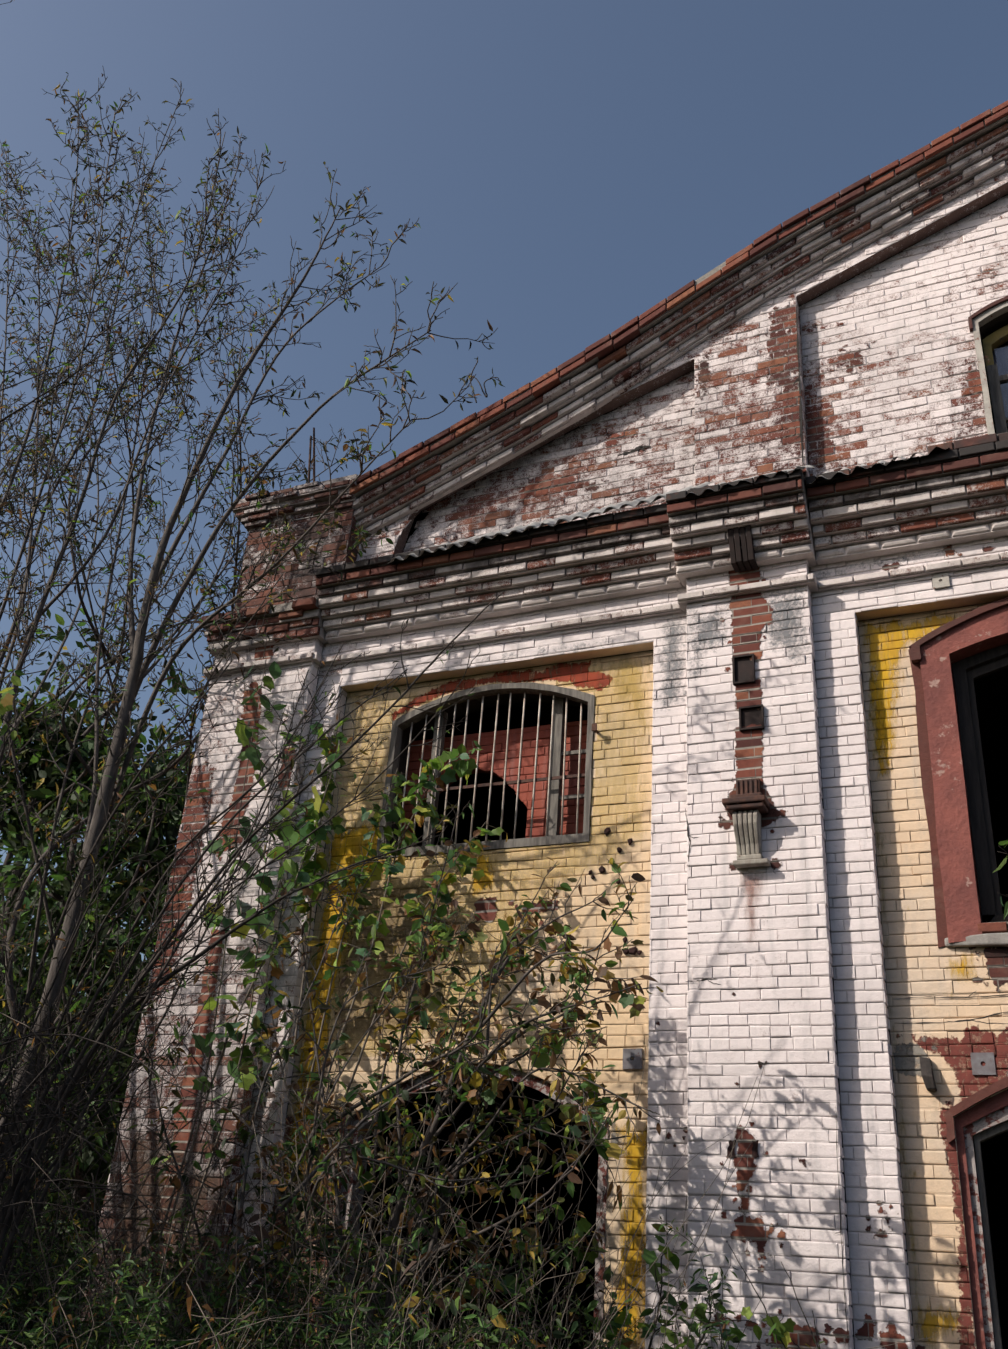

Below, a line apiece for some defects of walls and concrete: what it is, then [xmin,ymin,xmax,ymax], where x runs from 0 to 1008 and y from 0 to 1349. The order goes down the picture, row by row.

spalling [695,351,715,400]
flaking render [759,291,845,471]
flaking render [819,341,876,379]
flaking render [957,356,989,404]
flaking render [509,471,609,506]
leakage [660,611,725,705]
leakage [765,589,808,659]
flaking render [718,567,786,833]
spalling [968,947,1008,992]
peeling [720,1121,785,1272]
peeling [896,1025,1008,1349]
peeling [714,1313,925,1349]